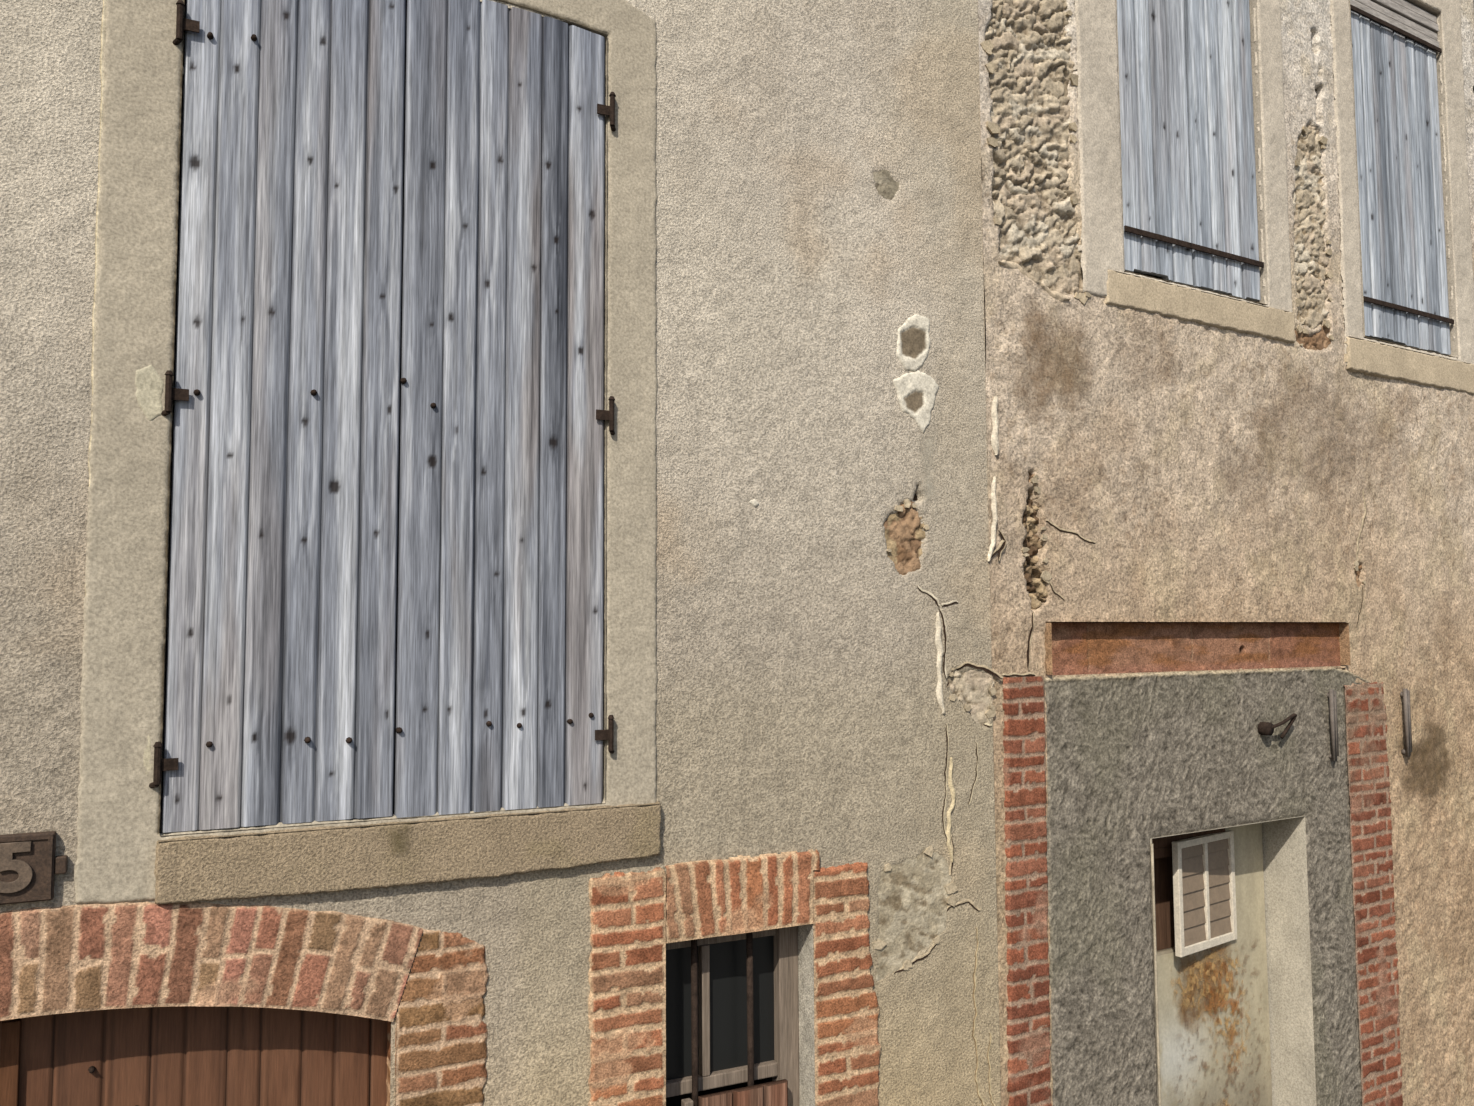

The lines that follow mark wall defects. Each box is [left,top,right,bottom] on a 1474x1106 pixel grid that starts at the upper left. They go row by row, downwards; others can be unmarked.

flaking render [980,0,1092,305]
flaking render [1292,123,1334,350]
flaking render [883,499,929,575]
crack [986,529,1007,561]
flaking render [1021,471,1052,609]
crack [1046,519,1096,544]
crack [917,582,1064,841]
corrosion [1176,947,1245,1068]